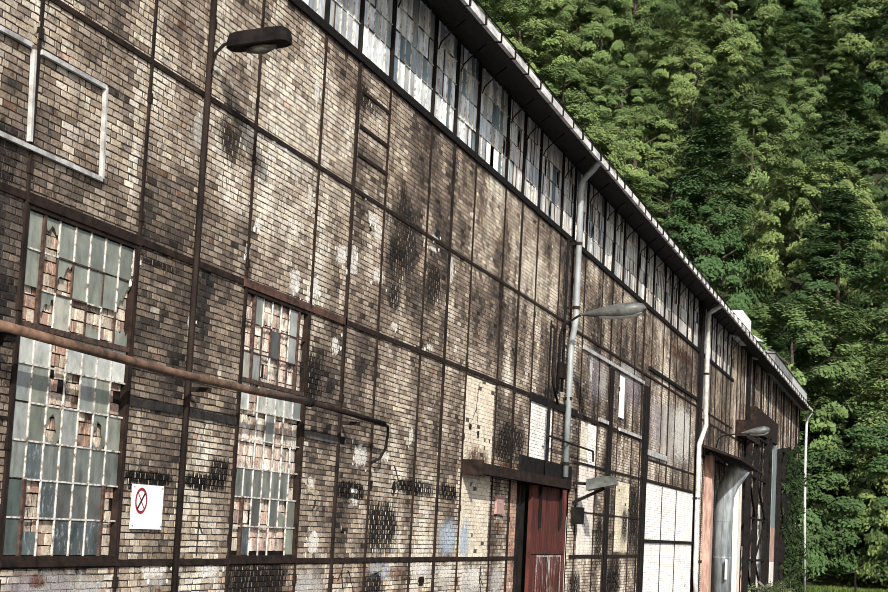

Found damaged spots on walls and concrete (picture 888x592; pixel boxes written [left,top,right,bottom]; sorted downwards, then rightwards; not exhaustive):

water stain [220,118,242,163]
water stain [385,185,416,310]
water stain [425,265,442,307]
rust [242,295,306,396]
rust [236,497,244,555]